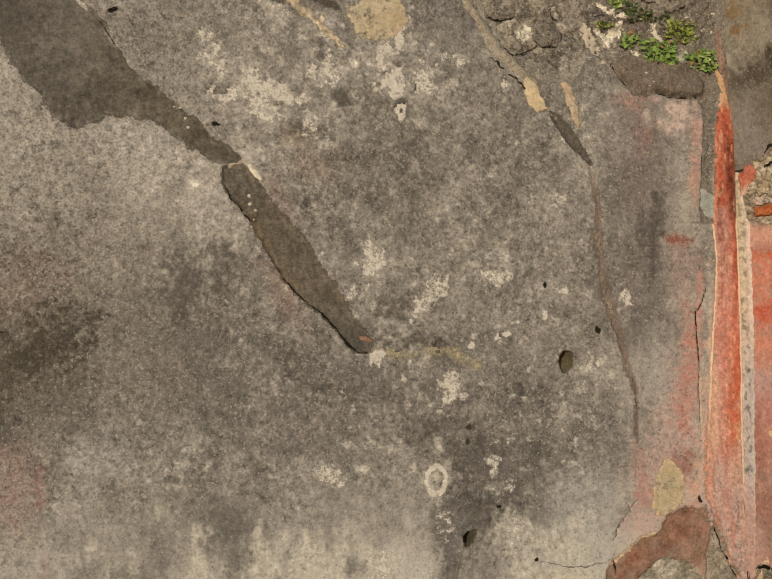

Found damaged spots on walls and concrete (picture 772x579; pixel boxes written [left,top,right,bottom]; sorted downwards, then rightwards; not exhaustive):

spalling [737,143,772,225]
crack [589,168,638,442]
crack [691,289,706,421]
crack [542,559,616,576]
spalling [606,455,740,579]
spalling [754,557,772,579]